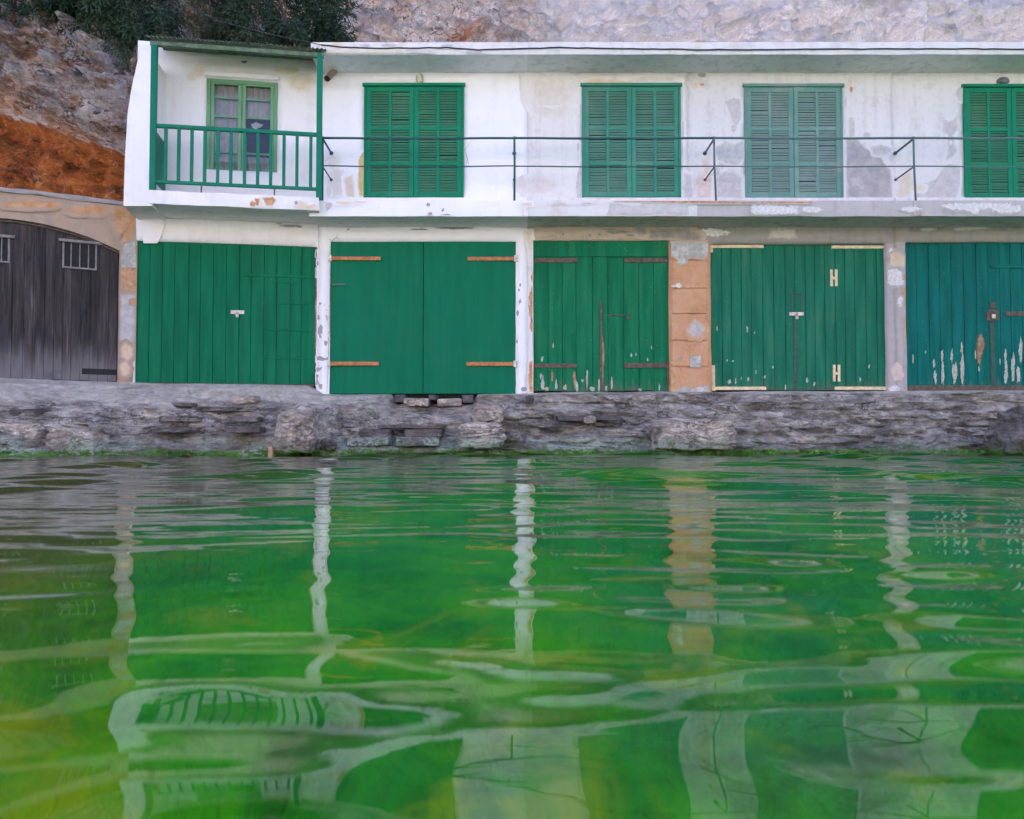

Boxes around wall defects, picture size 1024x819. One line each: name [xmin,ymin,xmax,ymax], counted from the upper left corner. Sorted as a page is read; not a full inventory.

peeling [603,96,825,215]
peeling [843,86,1023,215]
peeling [119,267,137,344]
peeling [315,302,329,390]
peeling [516,254,613,392]
peeling [886,246,906,341]
peeling [888,334,985,391]
peeling [999,339,1023,383]